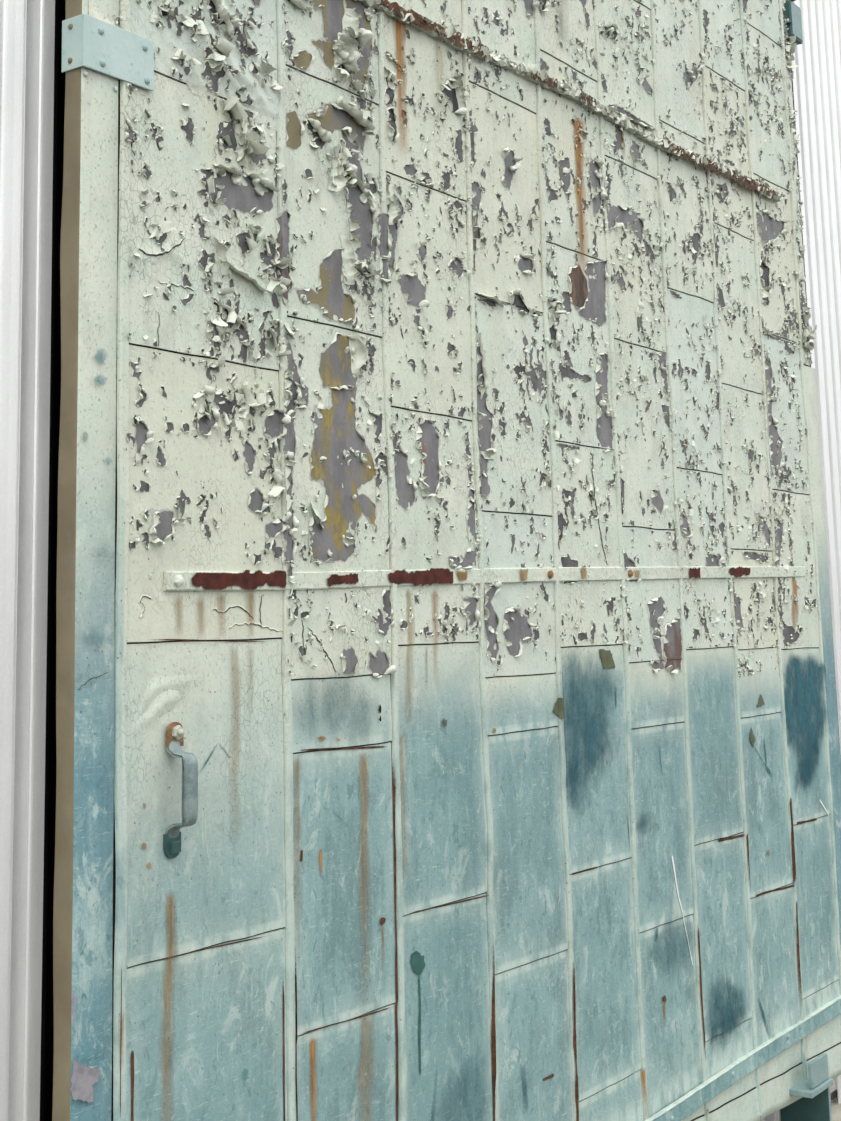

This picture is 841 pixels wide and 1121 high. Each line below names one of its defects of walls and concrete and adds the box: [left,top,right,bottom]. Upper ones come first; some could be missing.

rust [379,0,490,118]
rust [531,71,558,90]
rust [575,119,583,258]
rust [663,135,776,197]
peeling [116,0,818,679]
rust [192,570,287,612]
rust [327,573,359,587]
rust [388,568,467,626]
rust [283,767,399,1121]